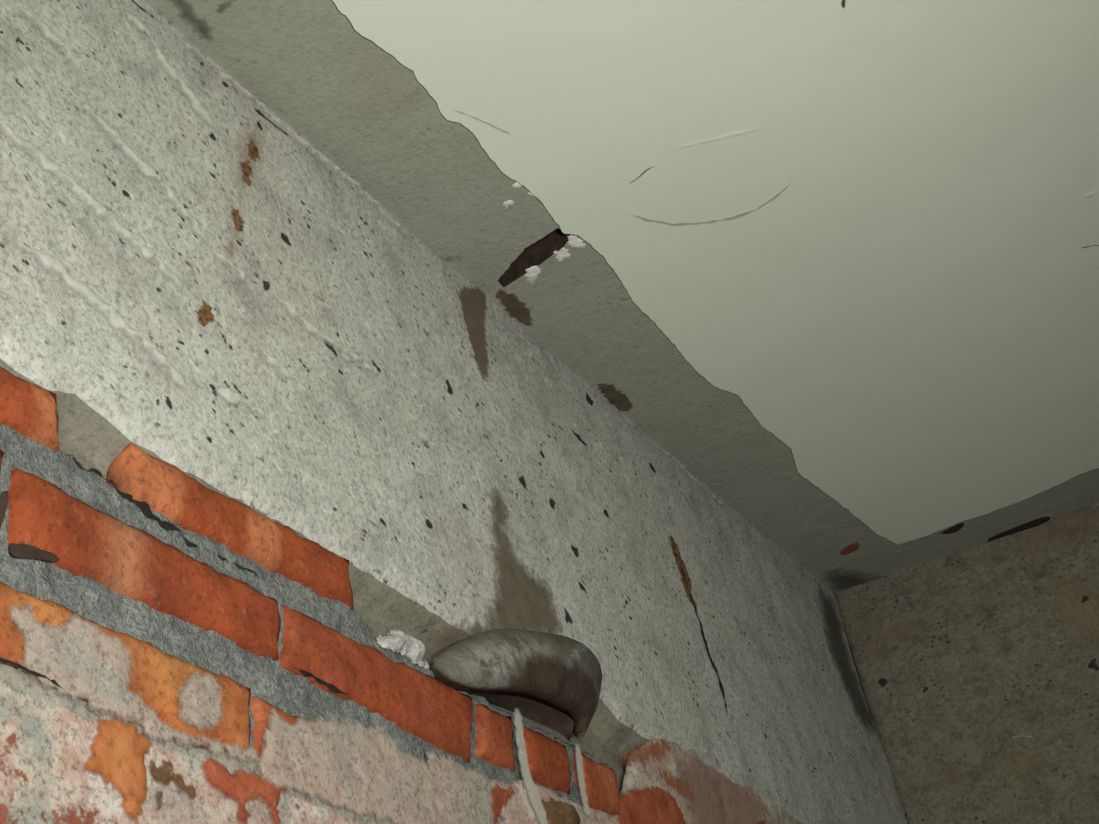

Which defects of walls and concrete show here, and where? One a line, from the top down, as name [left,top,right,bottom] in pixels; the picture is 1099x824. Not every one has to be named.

corrosion [231,207,244,231]
corrosion [241,140,259,186]
crack [635,186,788,226]
corrosion [197,301,214,337]
leakage [460,287,489,378]
flaking render [144,0,1099,593]
spalling [9,543,60,562]
leakage [424,496,560,657]
crack [670,536,728,714]
flaking render [11,605,515,824]
leakage [514,710,547,824]
flaking render [618,740,765,824]